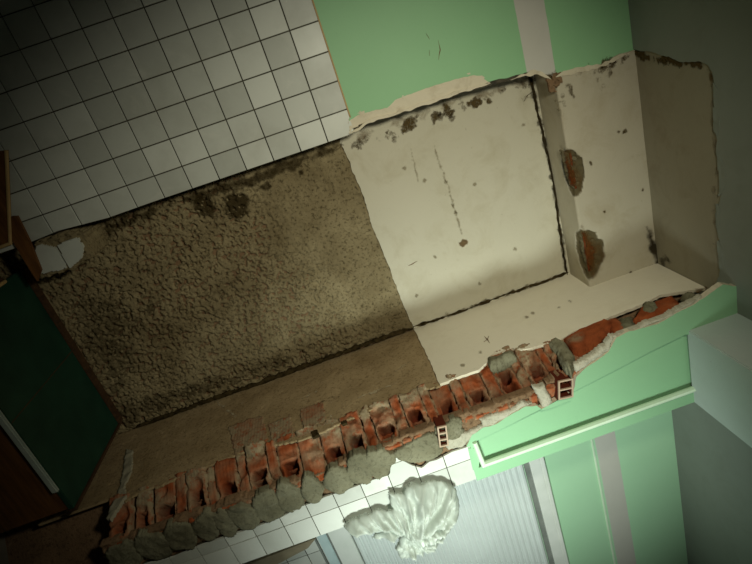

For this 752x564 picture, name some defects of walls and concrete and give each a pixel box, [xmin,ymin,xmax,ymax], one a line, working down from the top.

damp [385,116,417,140]
flaking render [348,73,491,134]
damp [431,103,455,124]
damp [467,96,492,108]
damp [183,159,303,218]
spalling [559,149,580,189]
crack [135,76,569,428]
spalling [99,292,702,564]